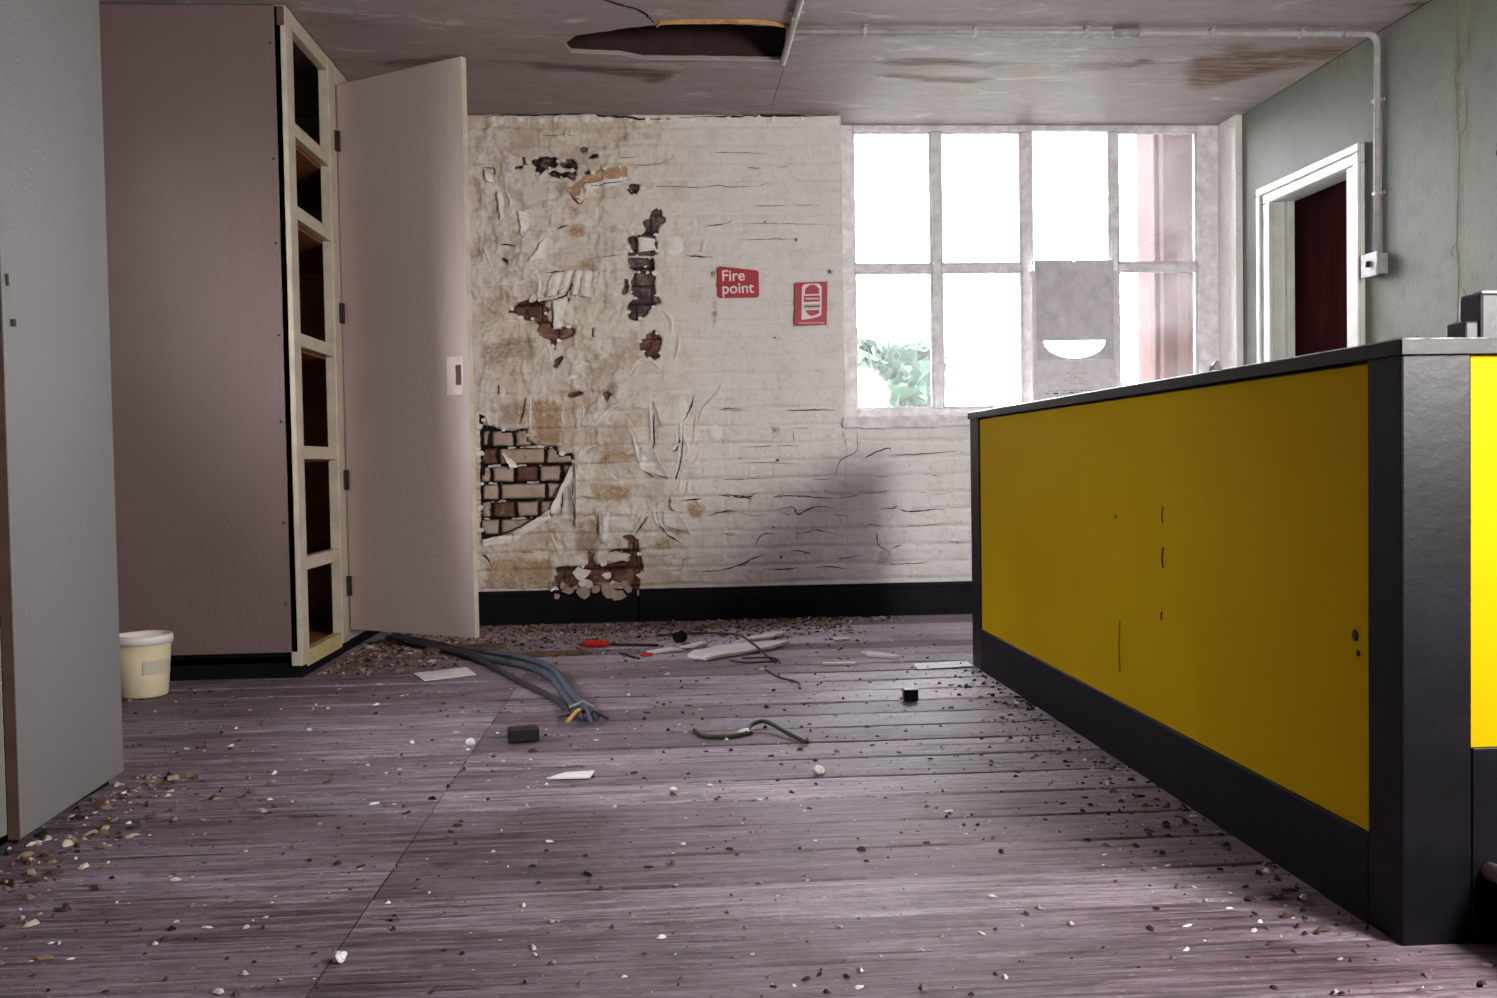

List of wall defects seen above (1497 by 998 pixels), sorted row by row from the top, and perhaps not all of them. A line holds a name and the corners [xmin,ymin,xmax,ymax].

peeling [484,169,531,234]
peeling [514,147,642,200]
spalling [508,235,595,368]
spalling [622,206,668,361]
flaking render [476,414,577,546]
spalling [547,512,645,601]